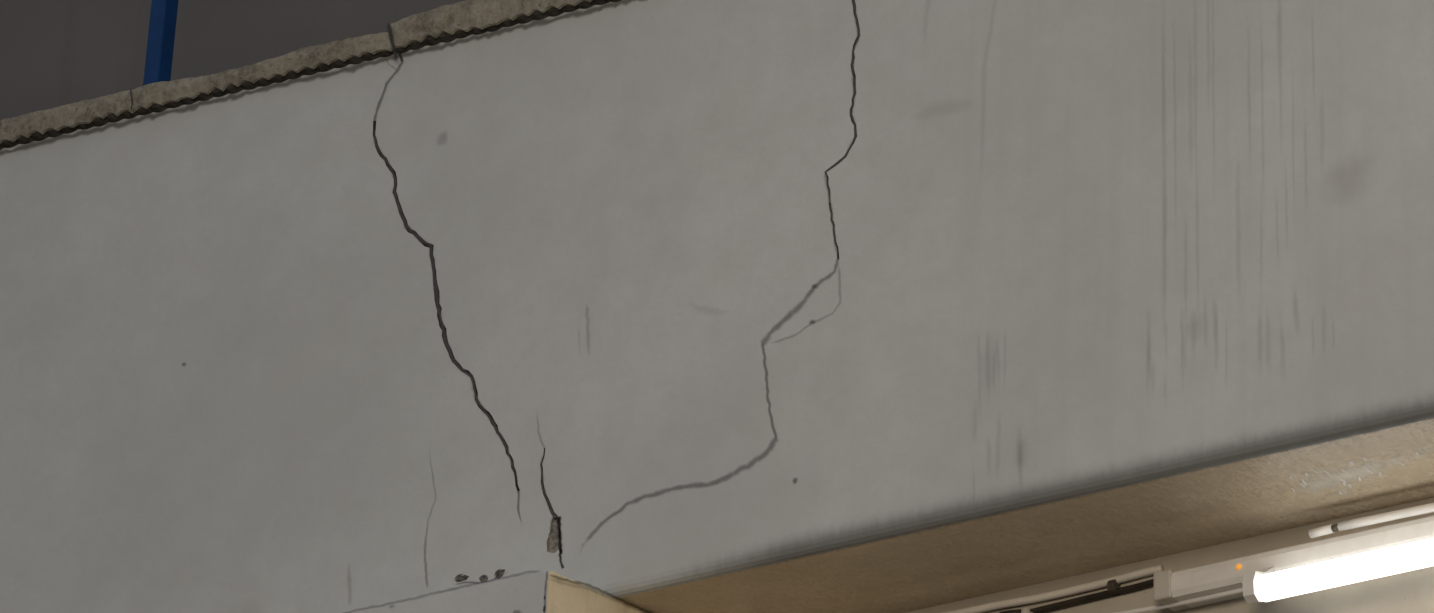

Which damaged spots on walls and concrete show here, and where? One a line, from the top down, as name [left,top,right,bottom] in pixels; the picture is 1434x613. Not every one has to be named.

crack [387,24,403,62]
crack [825,0,860,260]
crack [373,121,653,613]